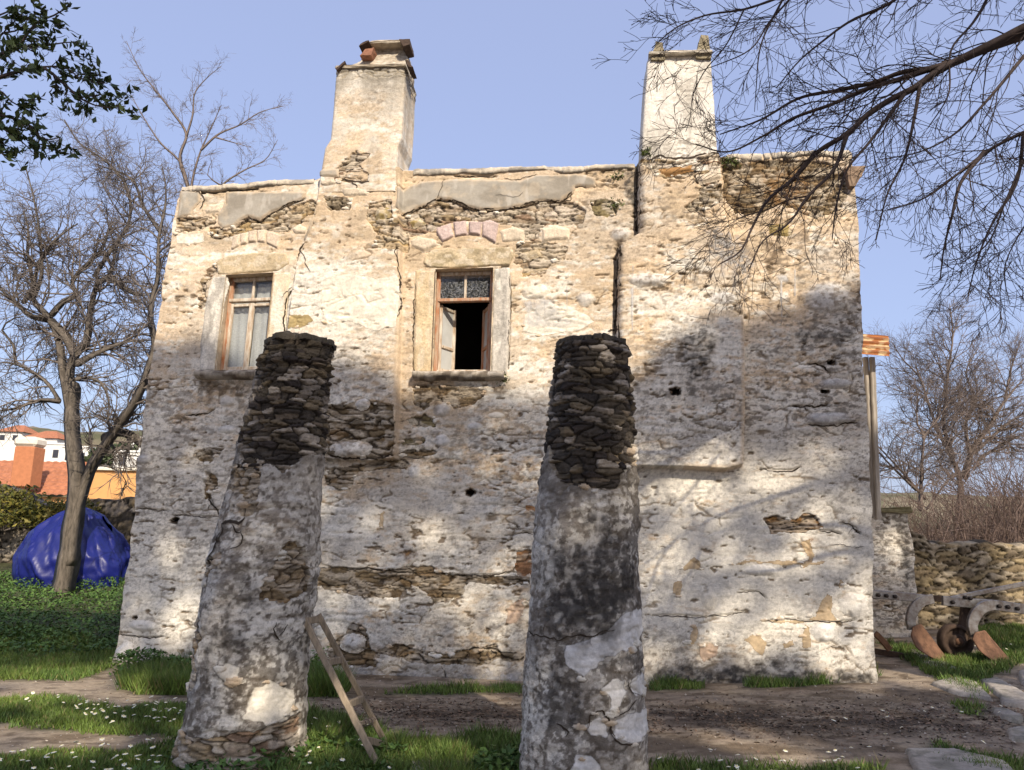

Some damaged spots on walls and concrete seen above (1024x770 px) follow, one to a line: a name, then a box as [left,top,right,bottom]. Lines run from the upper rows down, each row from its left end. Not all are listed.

spalling [172,196,353,246]
spalling [334,150,369,184]
crack [398,174,572,218]
spalling [367,198,620,277]
spalling [640,152,848,219]
crack [282,243,310,331]
spalling [193,273,486,517]
spalling [521,303,639,493]
spalling [729,513,825,568]
spalling [259,541,532,604]
crack [529,625,614,641]